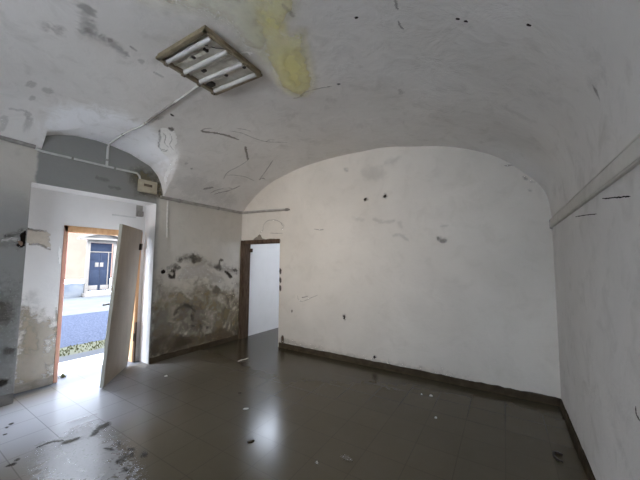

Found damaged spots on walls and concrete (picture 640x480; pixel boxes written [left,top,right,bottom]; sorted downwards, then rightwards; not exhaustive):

peeling [0,228,51,250]
mould [168,255,201,279]
damp [0,302,56,387]
damp [151,282,239,356]